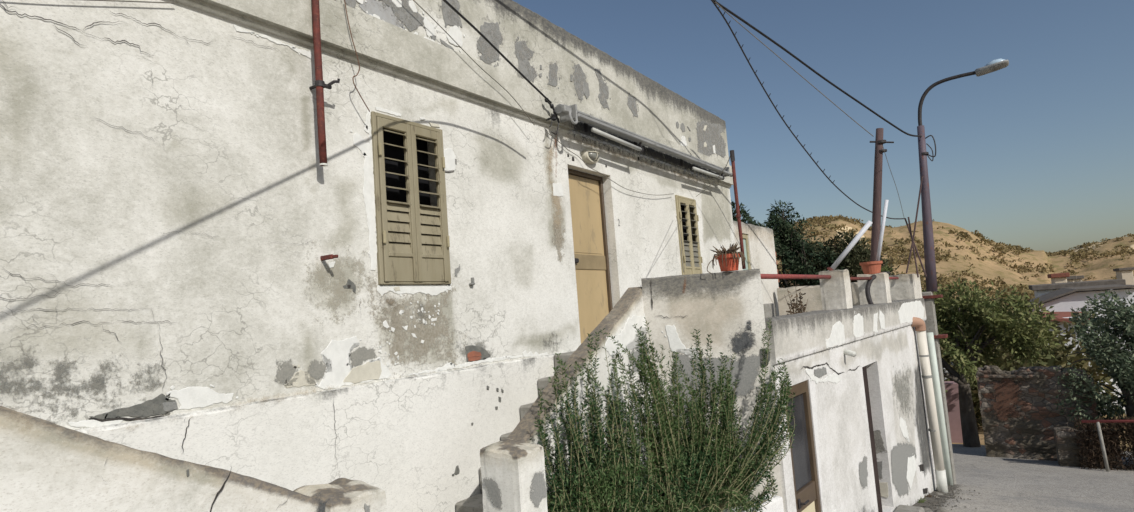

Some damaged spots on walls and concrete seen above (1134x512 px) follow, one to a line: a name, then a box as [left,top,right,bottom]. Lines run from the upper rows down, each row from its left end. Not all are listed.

crack [0,0,281,82]
flaking render [345,0,611,110]
leakage [0,357,111,404]
crack [0,270,176,391]
flaking render [68,384,238,428]
peeling [275,336,391,390]
leakage [311,258,491,366]
peeling [604,313,648,373]
flaking render [662,325,770,411]
crack [800,362,859,375]
crack [210,466,232,512]
flaking render [859,417,928,498]